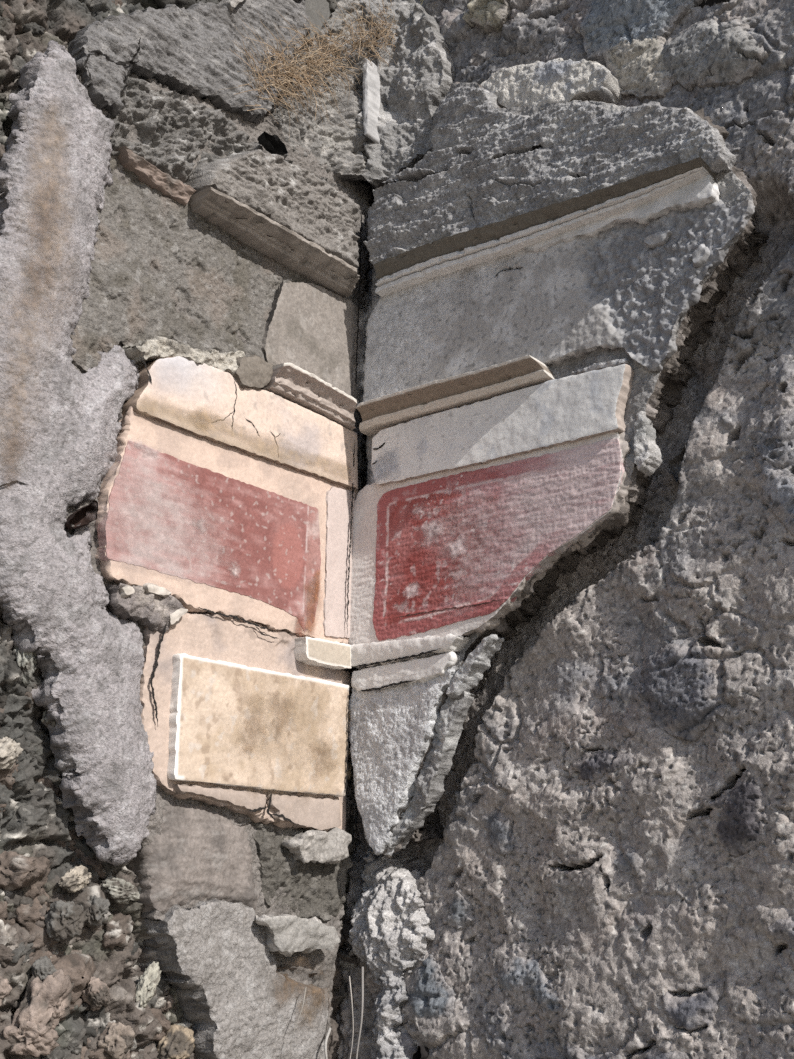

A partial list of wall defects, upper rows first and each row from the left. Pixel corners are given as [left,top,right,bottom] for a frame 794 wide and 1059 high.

crack [214,384,281,455]
crack [150,623,167,726]
crack [249,791,295,824]